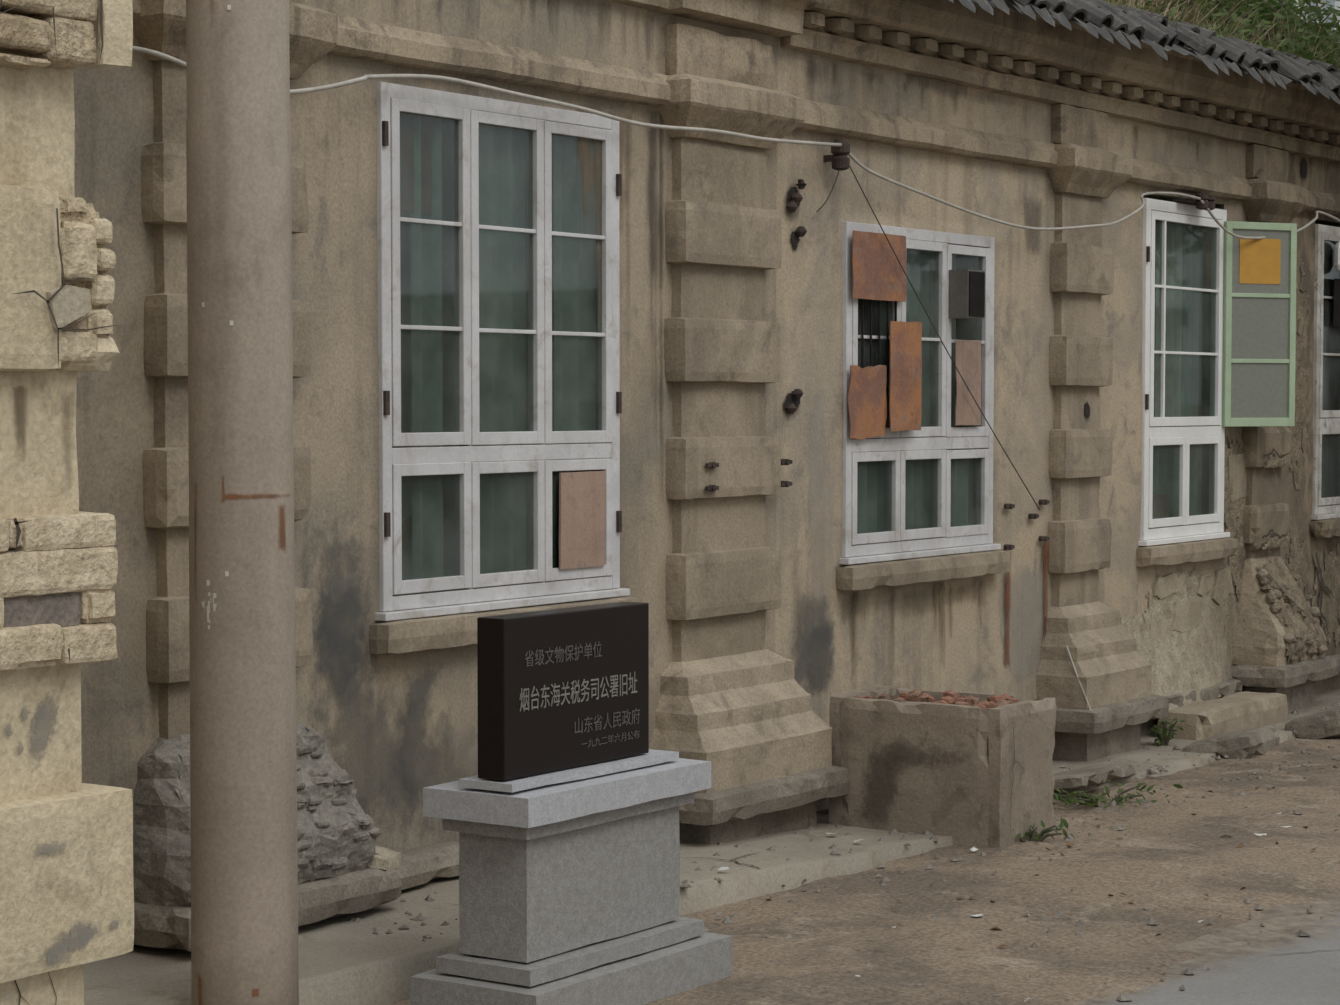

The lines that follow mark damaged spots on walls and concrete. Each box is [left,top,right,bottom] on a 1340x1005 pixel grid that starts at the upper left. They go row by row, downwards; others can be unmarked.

crack [14,208,117,368]
spalling [1263,250,1310,501]
rust [222,483,285,548]
spalling [1143,436,1340,663]
peeling [5,695,59,760]
peeling [41,920,119,965]